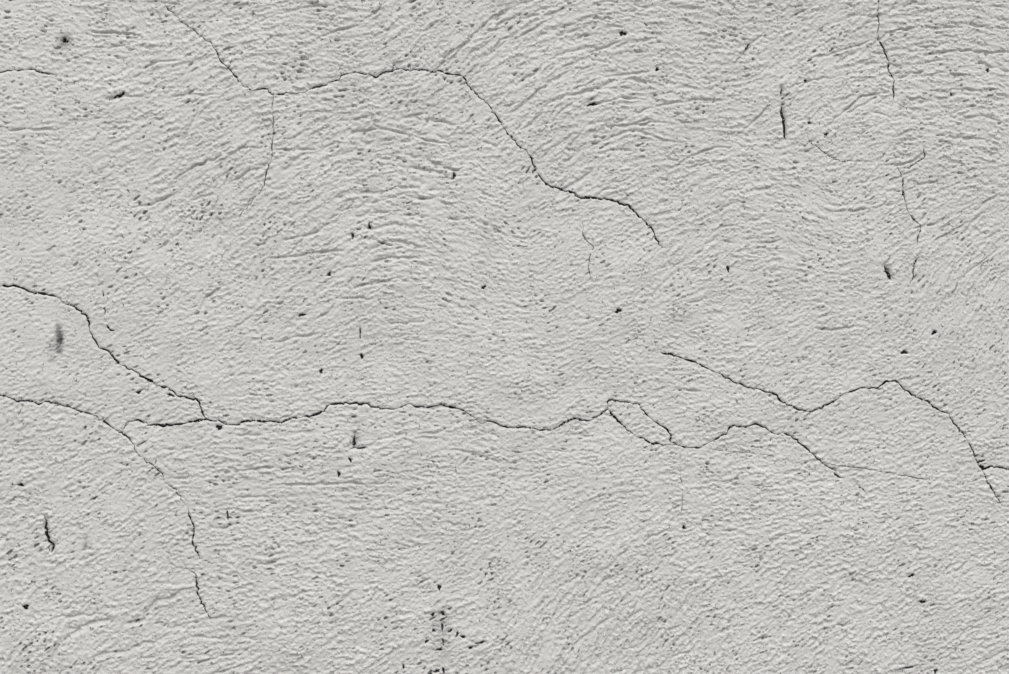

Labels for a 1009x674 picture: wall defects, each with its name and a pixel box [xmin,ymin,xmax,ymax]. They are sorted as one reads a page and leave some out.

crack [166,6,667,249]
crack [877,0,908,113]
crack [898,149,925,283]
crack [0,285,926,619]
crack [654,351,1008,505]